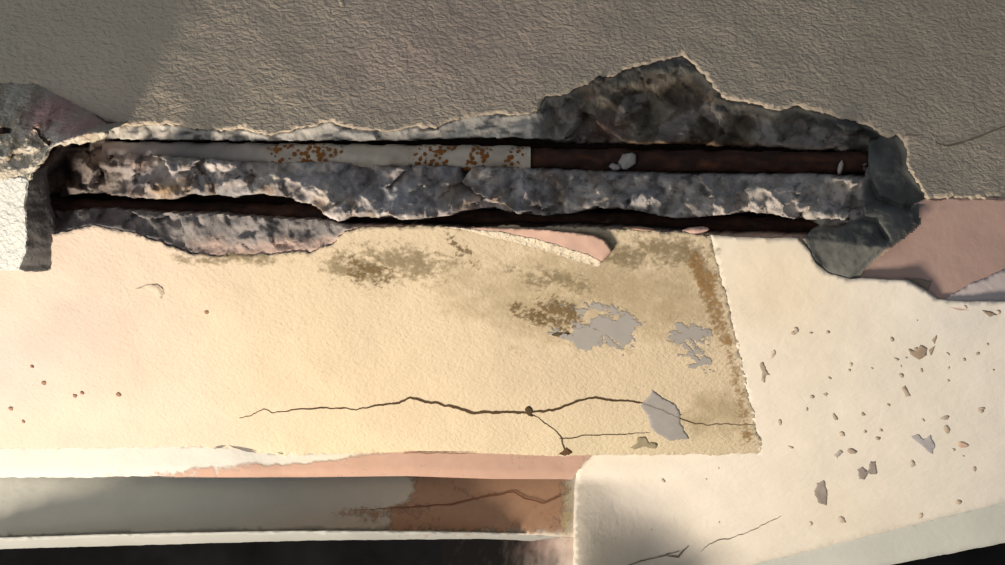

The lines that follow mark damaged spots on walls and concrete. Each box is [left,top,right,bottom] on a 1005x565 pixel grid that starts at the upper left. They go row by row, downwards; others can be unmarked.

crack [0,127,51,146]
corrosion [267,143,343,163]
corrosion [411,145,457,166]
corrosion [461,145,493,171]
spalling [37,56,1005,317]
water stain [329,234,478,289]
water stain [605,240,697,269]
water stain [506,273,586,333]
flaking render [893,335,937,397]
crack [214,445,283,455]
crack [242,397,749,450]
peeling [631,390,689,449]